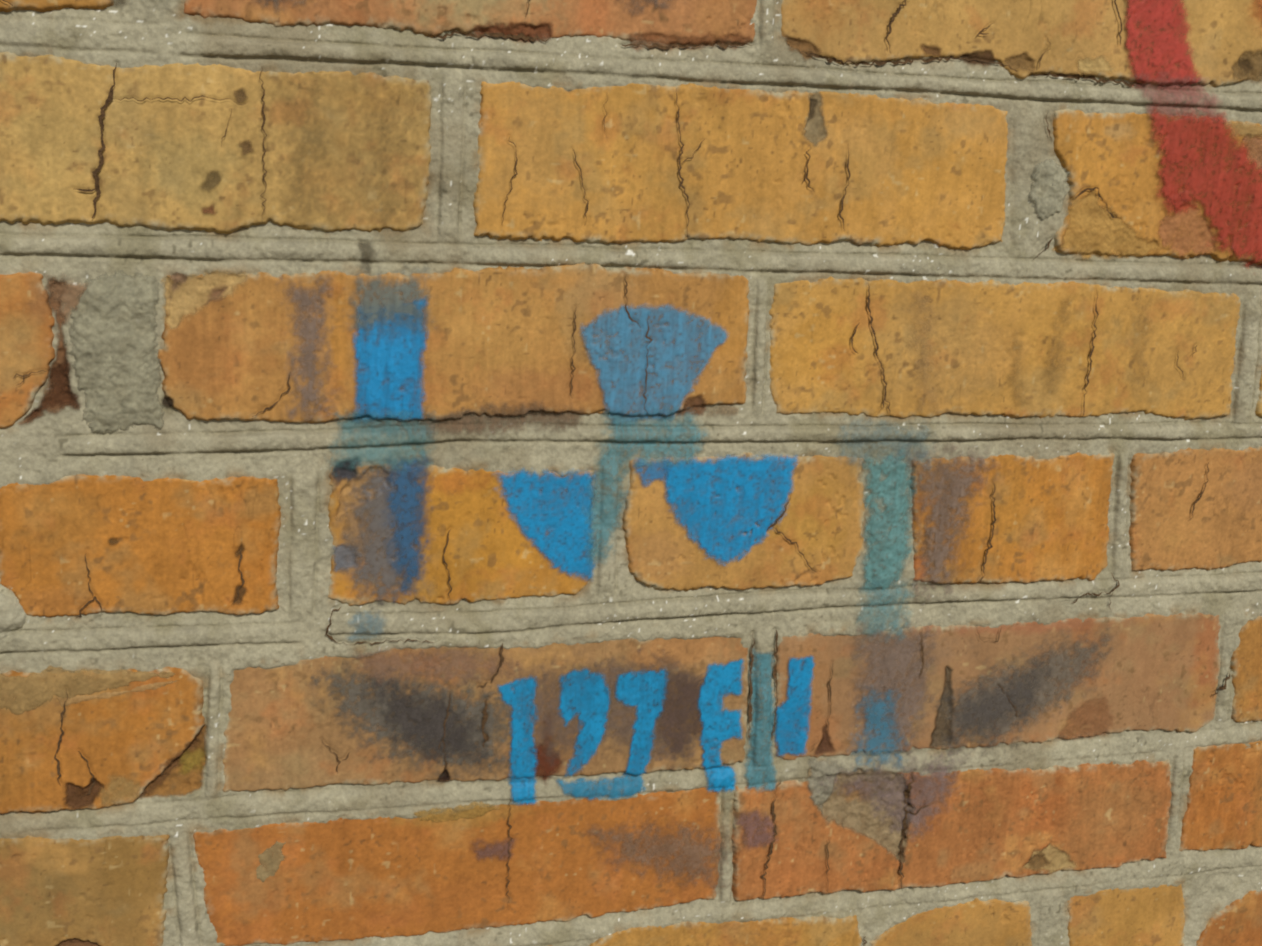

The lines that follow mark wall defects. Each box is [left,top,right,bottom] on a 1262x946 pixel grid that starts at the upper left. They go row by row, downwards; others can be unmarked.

crack [77,63,267,220]
crack [676,88,704,239]
peeling [804,92,827,145]
crack [803,146,851,228]
spalling [1063,191,1214,258]
spalling [1233,51,1262,81]
spalling [19,278,85,424]
crack [624,274,652,414]
crack [851,280,891,417]
crack [1082,290,1099,417]
spalling [65,725,207,809]
spalling [807,726,914,862]